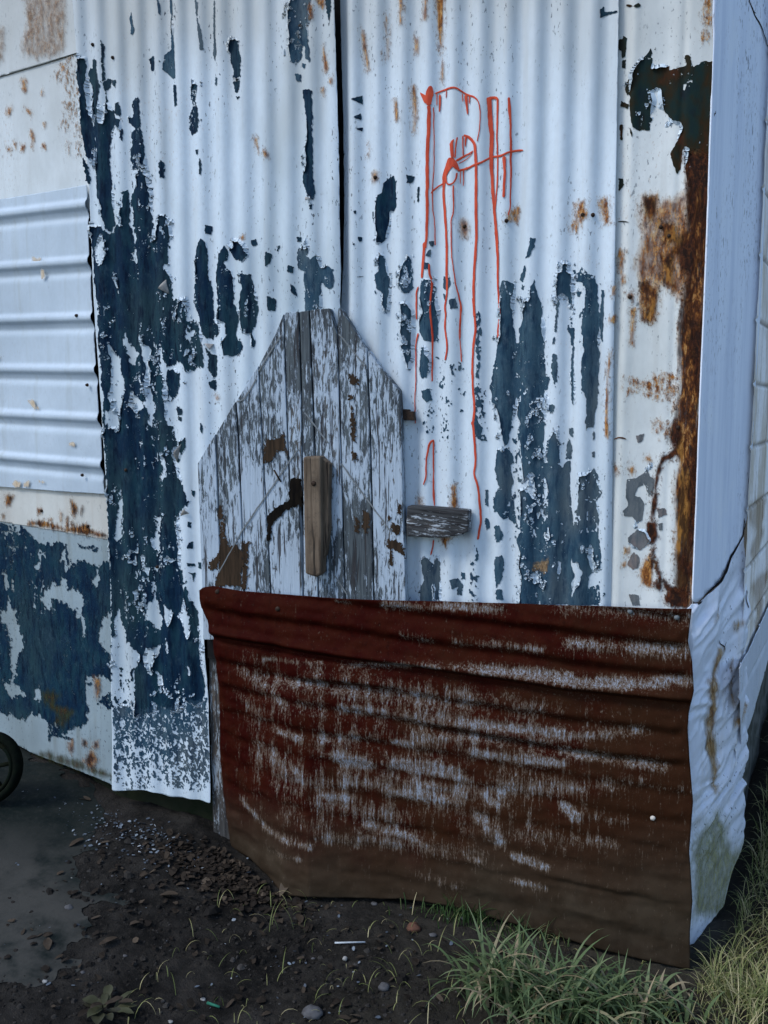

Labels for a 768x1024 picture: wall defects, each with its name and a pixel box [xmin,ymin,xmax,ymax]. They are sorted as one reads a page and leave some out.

peeling [149,0,177,107]
peeling [281,0,315,209]
peeling [618,36,716,175]
peeling [287,237,334,311]
peeling [0,40,280,791]
peeling [353,175,606,606]
rust [27,498,106,538]
rust [199,151,709,970]
crack [698,518,746,605]
rust [705,648,747,790]